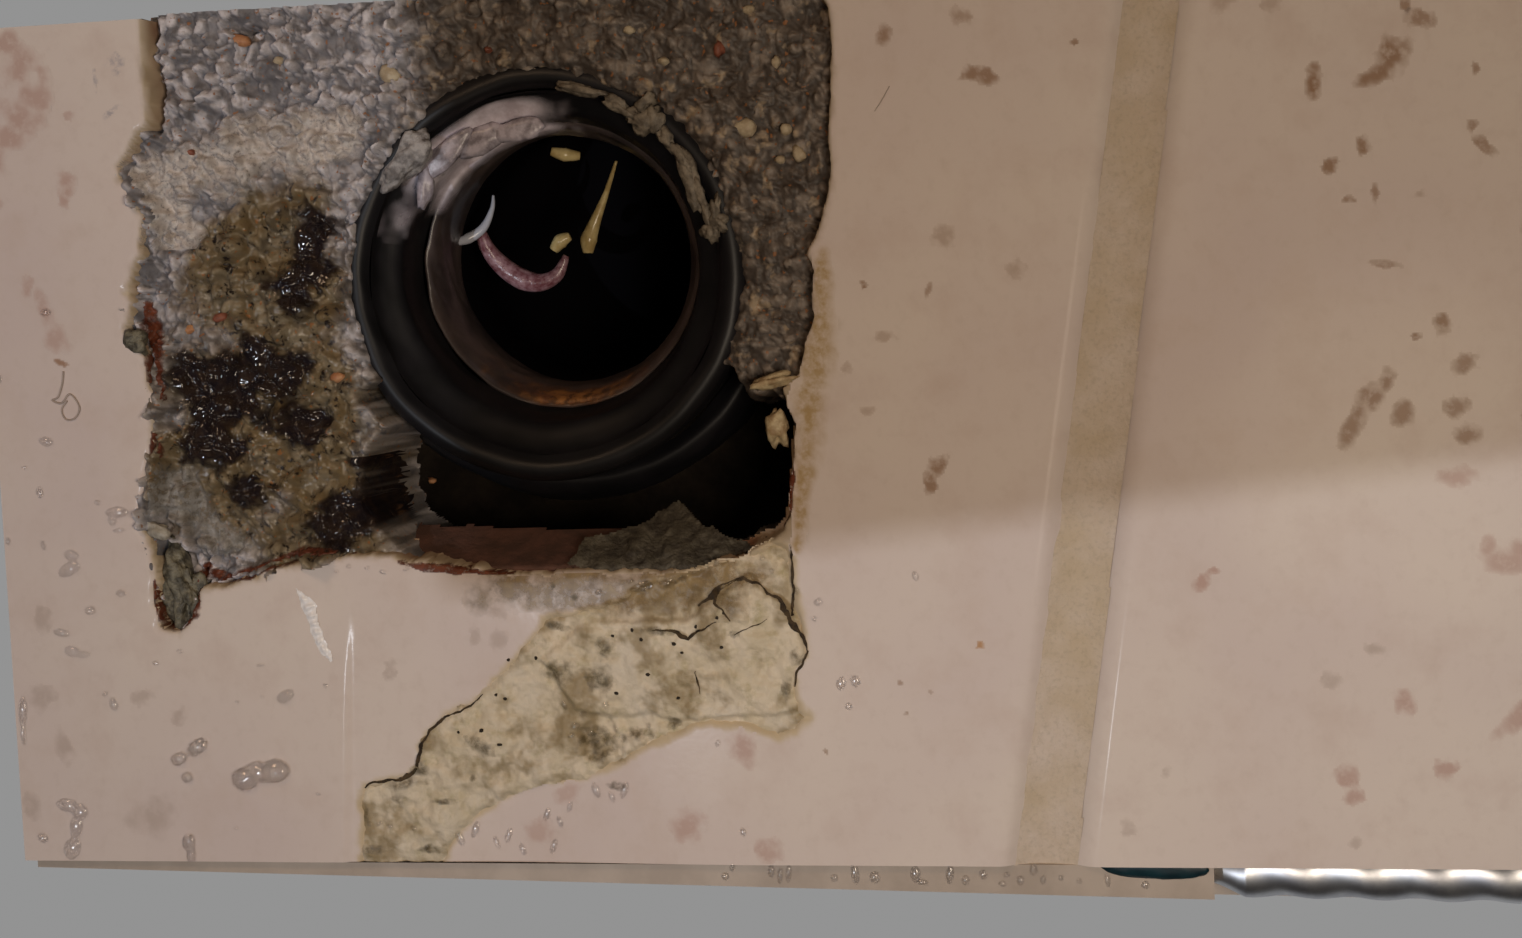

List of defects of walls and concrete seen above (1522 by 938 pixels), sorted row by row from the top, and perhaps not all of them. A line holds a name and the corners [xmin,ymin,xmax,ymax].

water stain [1350,0,1438,90]
corrosion [140,301,167,402]
water stain [261,198,344,317]
spalling [115,0,832,600]
corrosion [149,433,163,458]
water stain [147,332,332,556]
water stain [1335,365,1418,453]
water stain [305,450,415,553]
corrosion [153,547,357,631]
corrosion [398,560,516,575]
crack [654,545,809,694]
spalling [362,517,806,862]